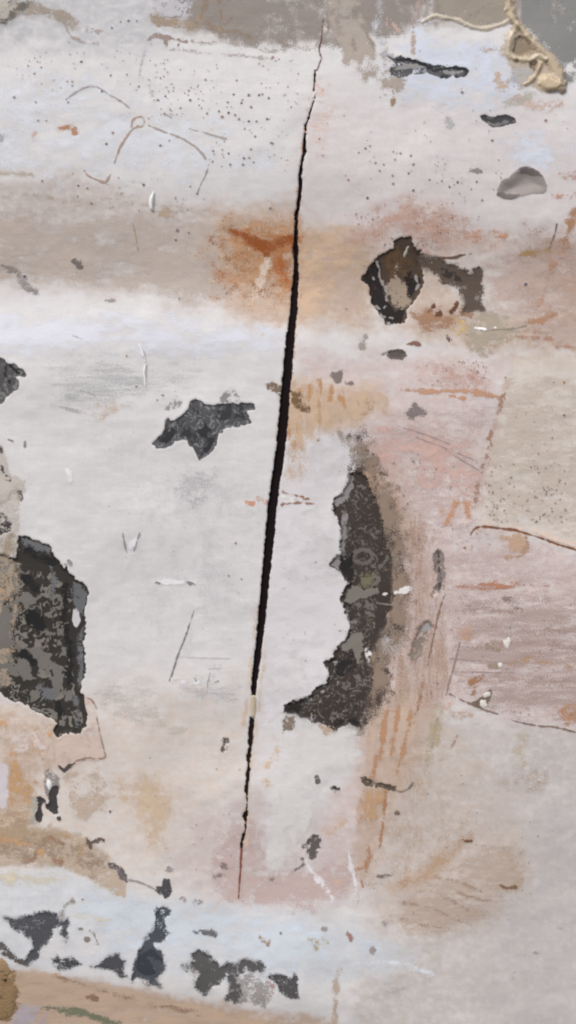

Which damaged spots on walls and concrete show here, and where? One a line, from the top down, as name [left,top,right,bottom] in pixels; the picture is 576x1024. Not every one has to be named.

peeling [379,50,469,84]
peeling [480,114,516,127]
peeling [361,236,486,326]
peeling [0,358,26,404]
peeling [152,390,255,461]
crack [238,20,324,899]
rust [187,68,576,888]
peeling [250,424,446,740]
peeling [0,445,89,811]
peeling [0,867,203,1022]
peeling [193,929,218,938]
peeling [181,949,300,1009]